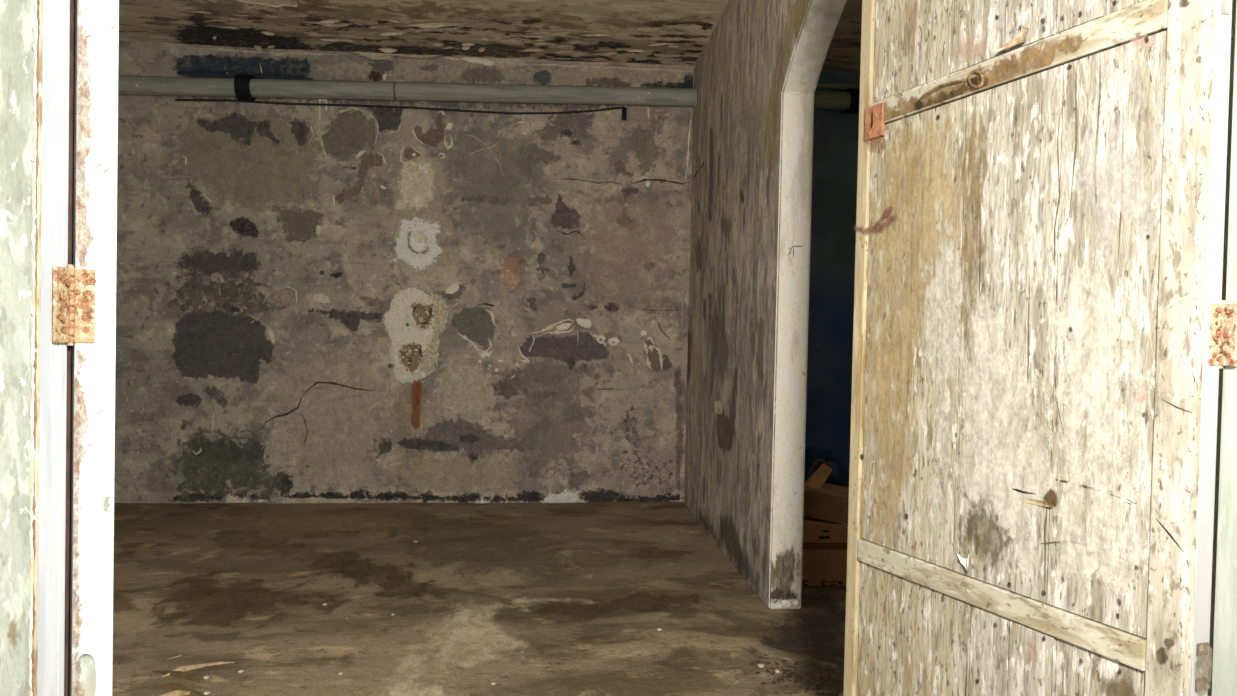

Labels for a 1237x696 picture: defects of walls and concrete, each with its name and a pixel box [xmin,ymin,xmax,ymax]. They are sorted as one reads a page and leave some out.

peeling [174,0,713,73]
leakage [158,96,800,603]
spalling [383,271,672,386]
crack [214,381,374,444]
corrosion [411,381,422,429]
leakage [153,571,344,633]
leakage [374,591,779,696]